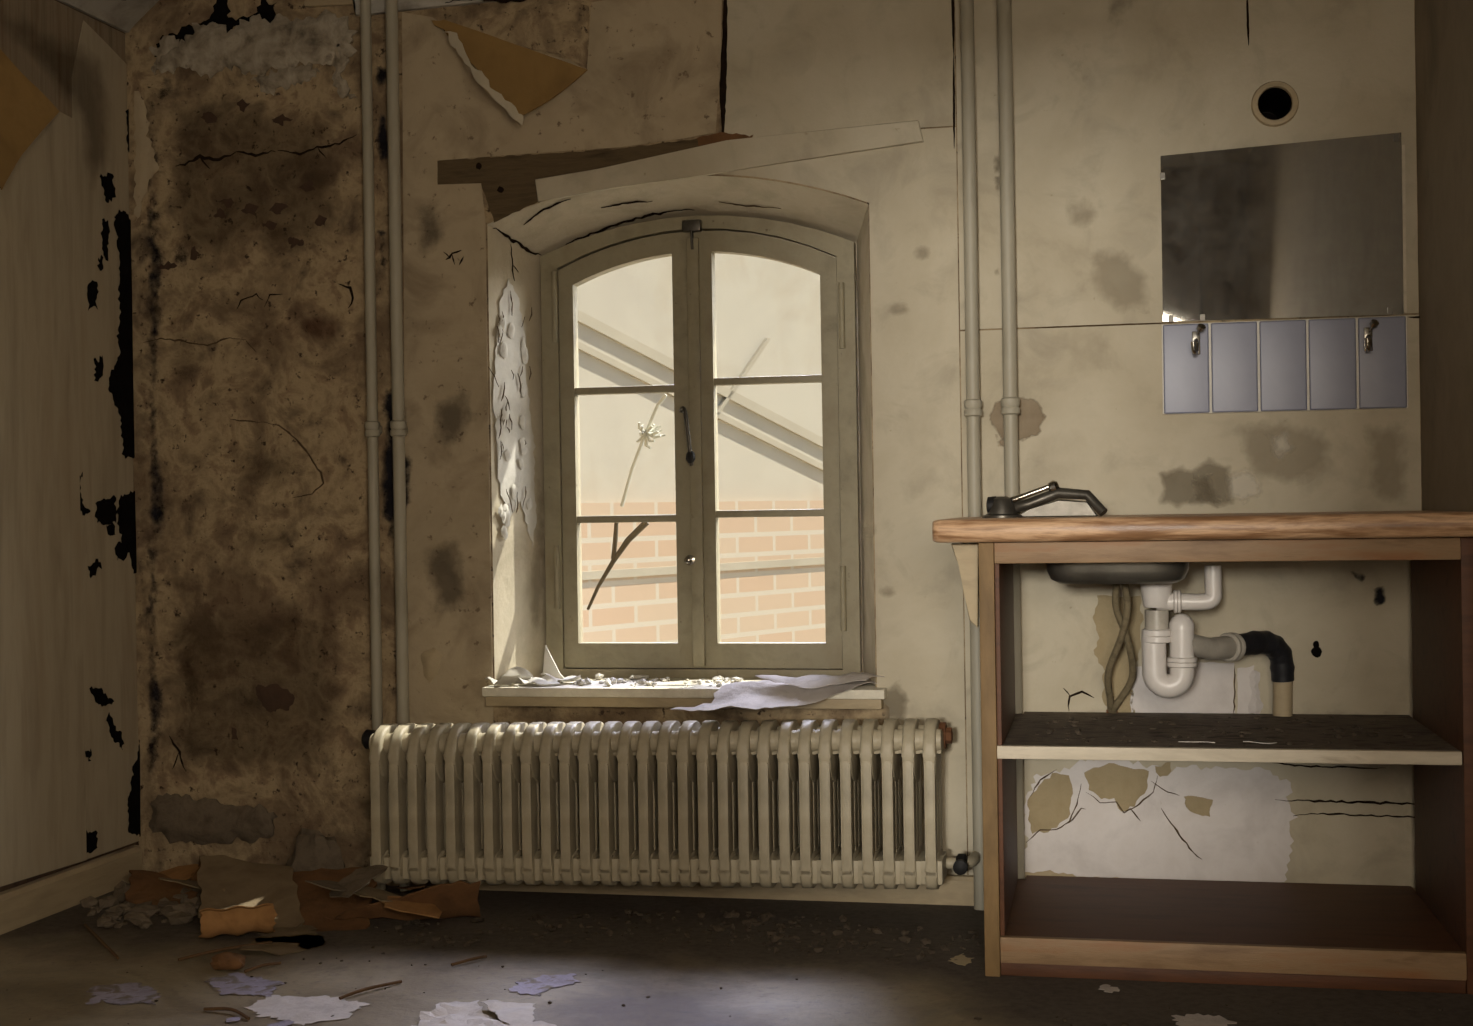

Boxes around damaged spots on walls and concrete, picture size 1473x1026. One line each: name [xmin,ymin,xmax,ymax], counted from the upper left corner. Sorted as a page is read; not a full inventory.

crack [1243,0,1251,45]
leakage [377,116,388,160]
peeling [87,91,159,459]
leakage [148,198,186,380]
peeling [80,472,137,578]
leakage [150,409,164,531]
leakage [382,393,409,535]
peeling [488,279,537,546]
leakage [1163,465,1260,503]
spalling [1093,595,1144,713]
leakage [149,678,161,768]
peeling [1024,760,1297,882]